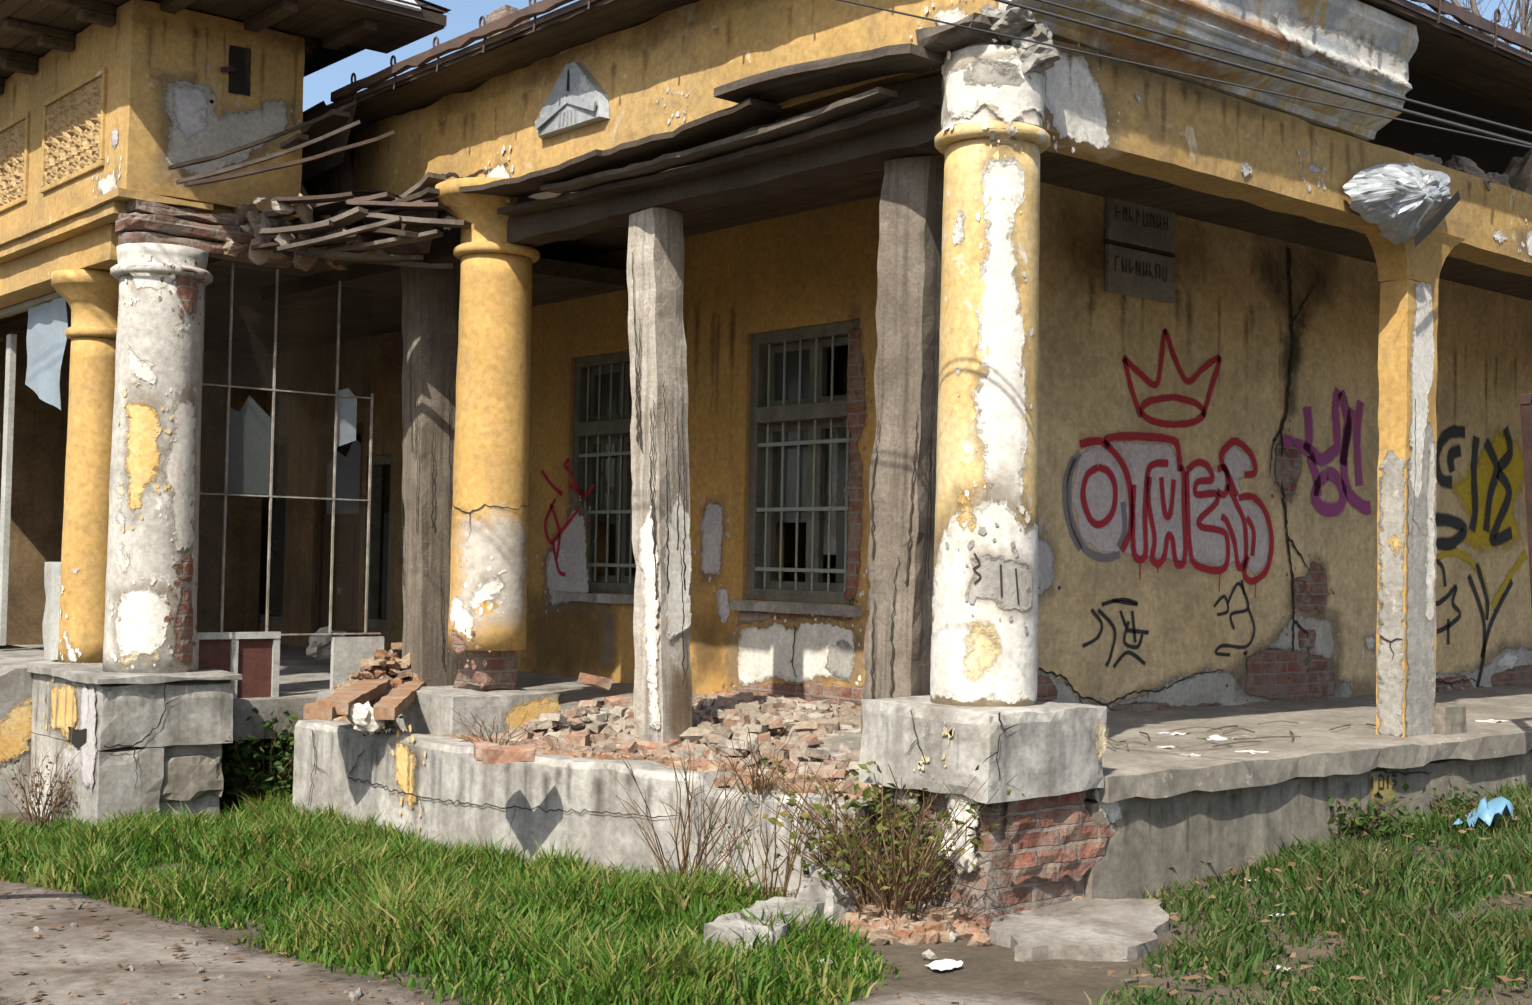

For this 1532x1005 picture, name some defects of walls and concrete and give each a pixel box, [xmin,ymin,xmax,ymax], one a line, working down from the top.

corrosion [1088,28,1230,84]
corrosion [1152,0,1322,55]
flaking render [160,45,301,177]
peeling [892,0,1532,813]
peeling [107,344,200,672]
crack [453,504,530,539]
peeling [694,323,873,705]
crack [1270,248,1314,679]
crack [104,682,182,789]
crack [308,730,678,835]
flaking render [932,794,980,873]
flaking render [1005,788,1123,885]